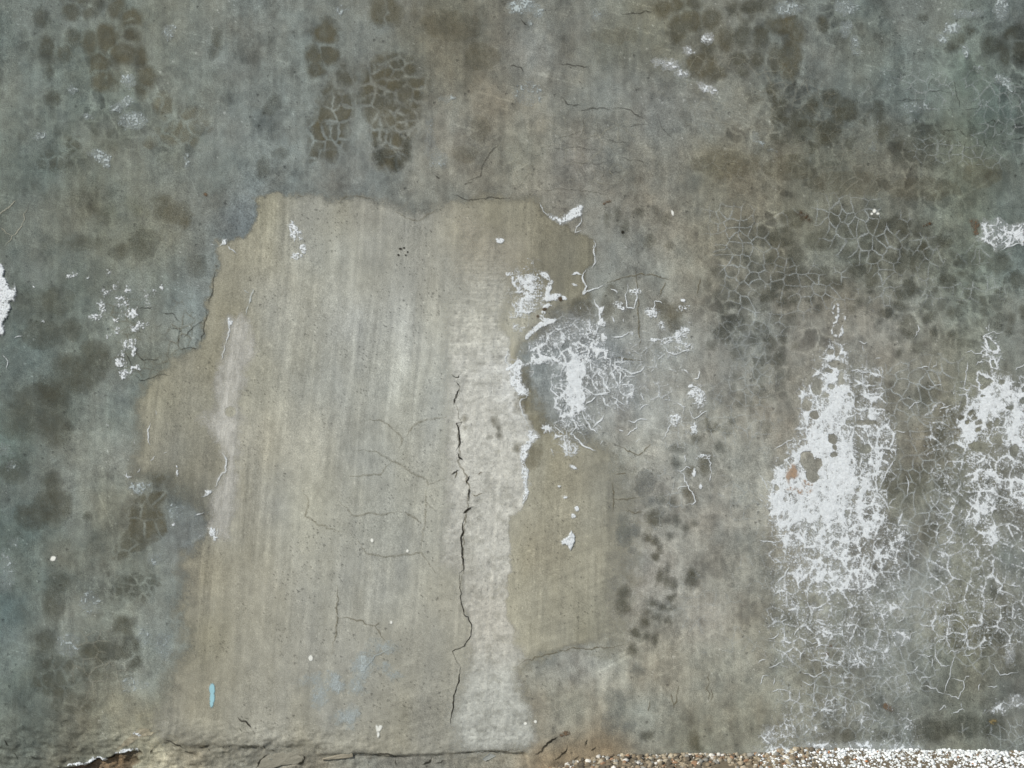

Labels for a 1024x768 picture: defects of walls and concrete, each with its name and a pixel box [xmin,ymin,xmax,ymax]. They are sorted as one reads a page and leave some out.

damp [655,0,801,94]
damp [362,53,423,168]
damp [540,204,583,232]
damp [981,218,1024,250]
damp [0,264,16,335]
damp [505,243,706,503]
crack [450,376,482,724]
peeling [440,222,538,753]
peeling [561,531,575,550]
damp [672,445,718,505]
damp [759,304,1024,752]
crack [902,459,949,619]